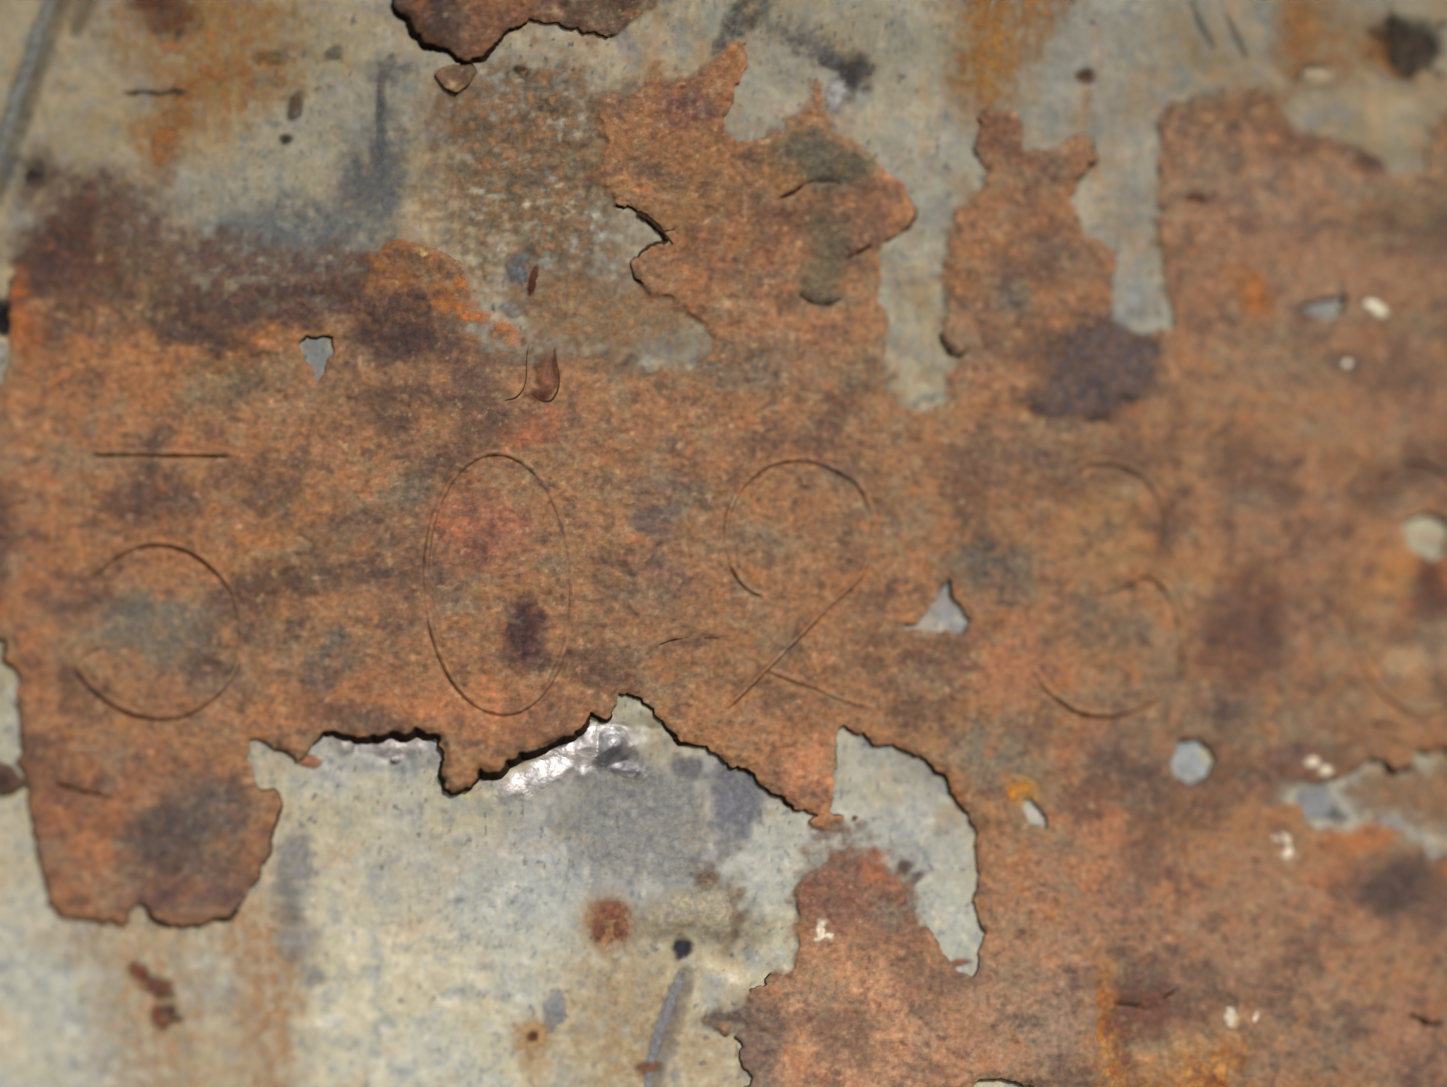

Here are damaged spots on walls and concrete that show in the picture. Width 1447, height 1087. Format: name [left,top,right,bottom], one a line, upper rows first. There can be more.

rust [390,0,642,296]
rust [72,539,245,721]
rust [422,448,576,716]
rust [723,455,878,712]
rust [1033,458,1187,718]
rust [1342,458,1447,715]
rust [0,762,26,795]
rust [1095,1010,1131,1051]
rust [1106,1051,1132,1087]
rust [1177,1053,1206,1087]
rust [1211,1044,1229,1063]
rust [1205,1058,1236,1087]